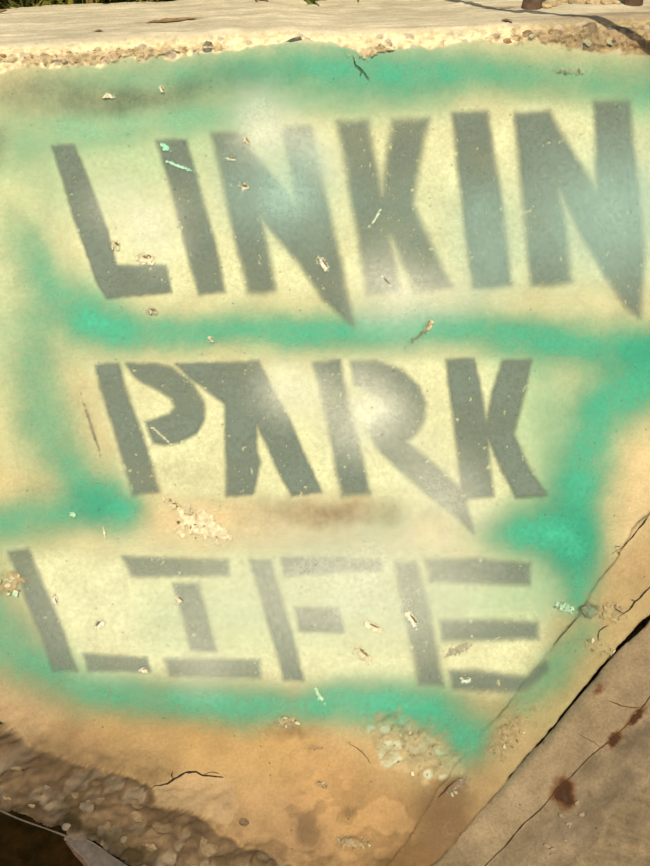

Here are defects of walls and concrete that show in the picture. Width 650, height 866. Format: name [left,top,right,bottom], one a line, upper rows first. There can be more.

spalling [0,41,233,67]
spalling [359,43,403,58]
peeling [162,496,232,545]
crack [612,516,649,554]
crack [598,587,650,639]
crack [568,697,650,780]
spalling [71,792,105,813]
crack [150,771,223,789]
rust [552,777,575,809]
spalling [129,799,175,851]
spalling [199,836,223,857]
crack [485,794,553,866]